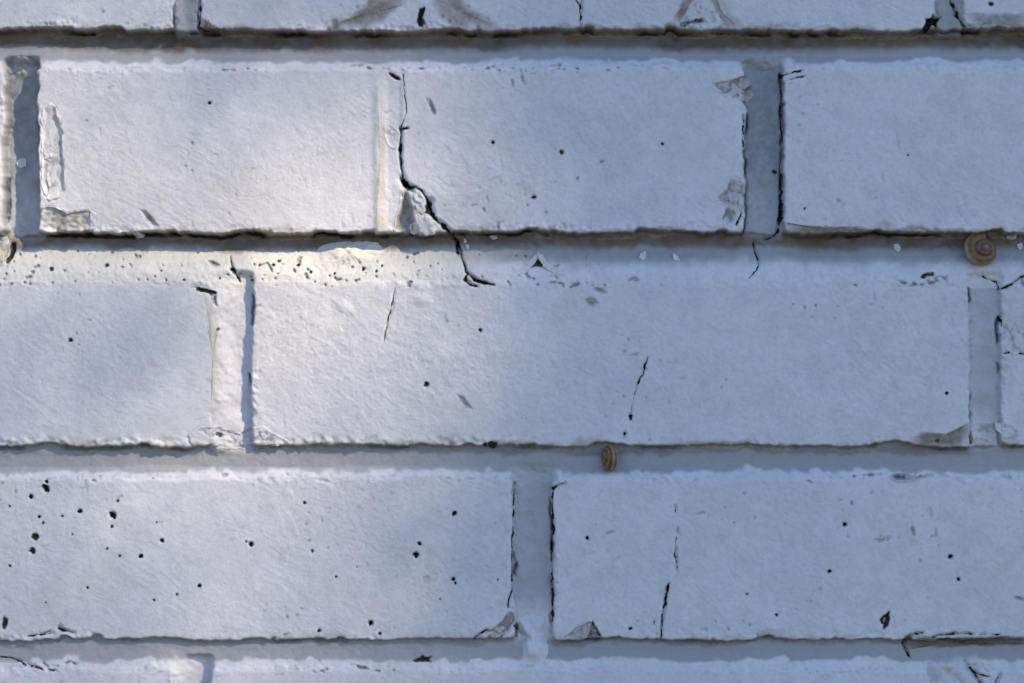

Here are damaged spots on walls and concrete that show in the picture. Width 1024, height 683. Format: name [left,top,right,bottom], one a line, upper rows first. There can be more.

spalling [712,75,754,103]
spalling [39,102,96,233]
spalling [393,180,442,238]
crack [398,74,494,287]
spalling [718,177,745,228]
crack [736,70,804,278]
crack [623,358,648,436]
crack [550,483,564,622]
crack [654,506,678,637]